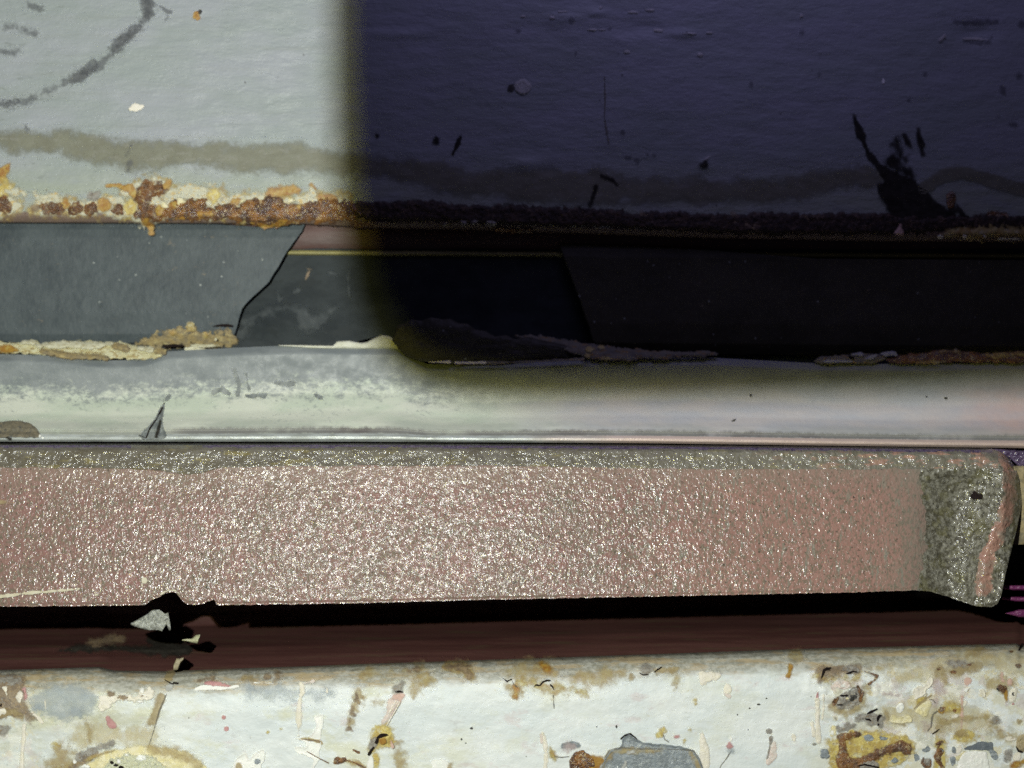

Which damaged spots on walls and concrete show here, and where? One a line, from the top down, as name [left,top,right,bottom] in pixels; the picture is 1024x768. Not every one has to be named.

damp [0,130,883,206]
corrosion [0,164,1024,243]
damp [919,167,1024,196]
peeling [21,339,154,361]
peeling [169,322,217,350]
corrosion [820,696,1014,768]